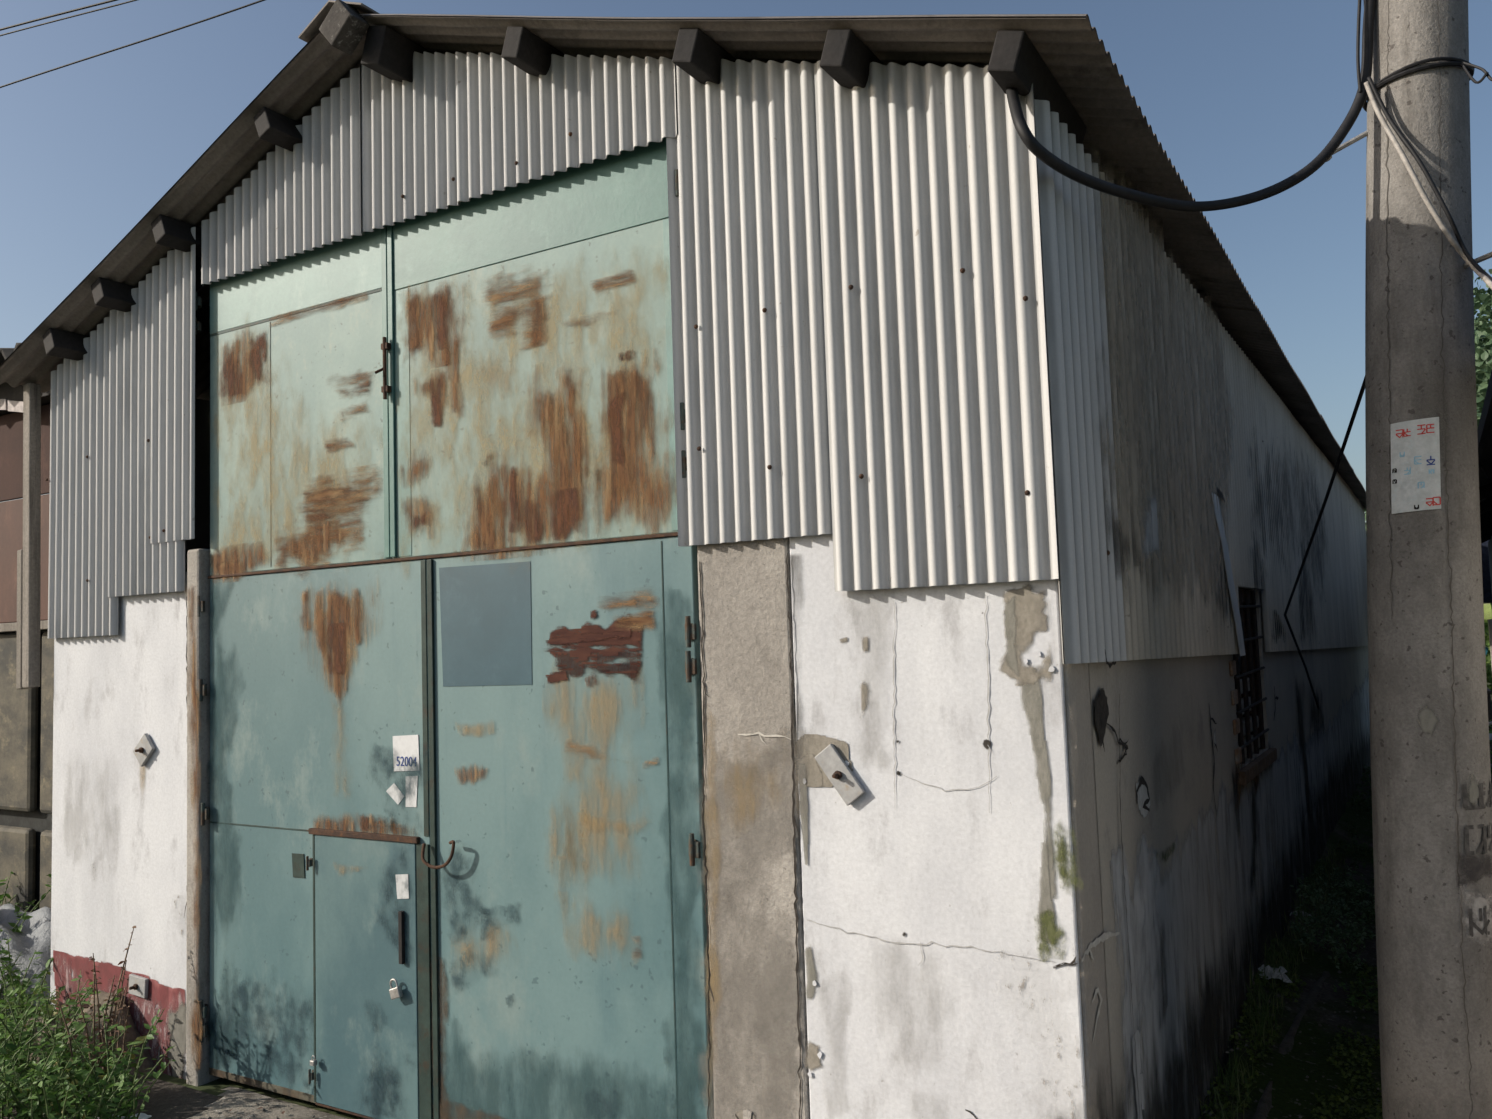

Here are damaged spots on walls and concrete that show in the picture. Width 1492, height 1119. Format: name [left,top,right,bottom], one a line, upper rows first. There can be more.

corrosion [211,295,378,581]
corrosion [405,271,671,559]
water stain [1101,176,1232,612]
corrosion [302,590,365,698]
crack [699,552,1140,1119]
peeling [1000,584,1056,944]
spalling [1094,688,1128,762]
water stain [1146,686,1371,1119]